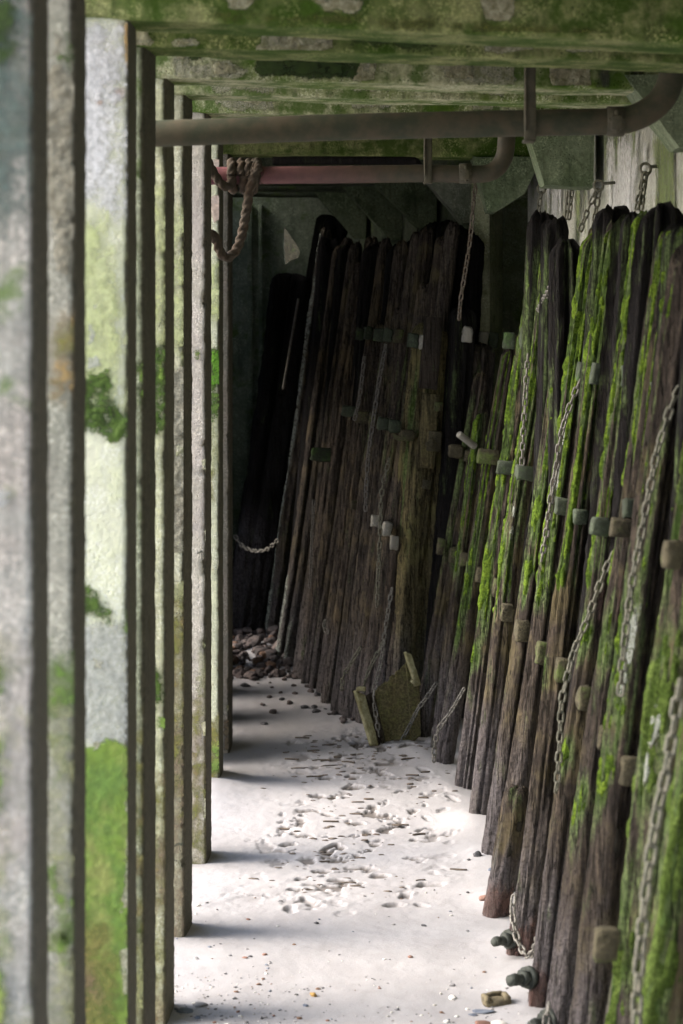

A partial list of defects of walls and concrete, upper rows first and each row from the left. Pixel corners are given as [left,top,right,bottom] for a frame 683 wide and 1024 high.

water stain [85,925,116,1024]